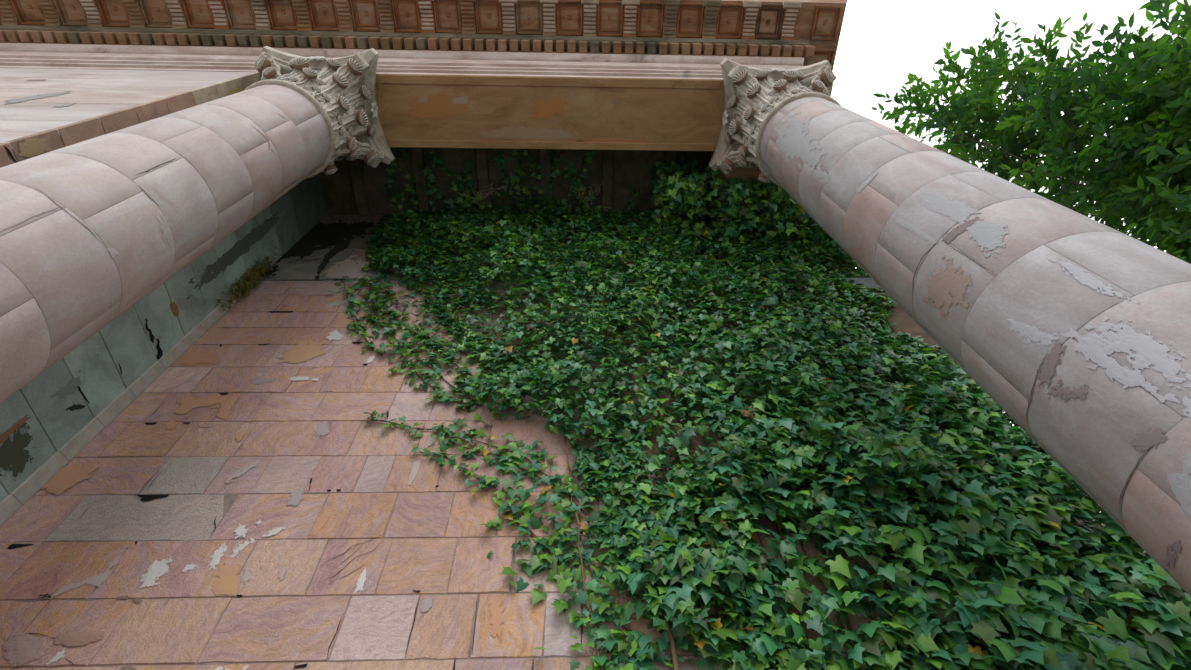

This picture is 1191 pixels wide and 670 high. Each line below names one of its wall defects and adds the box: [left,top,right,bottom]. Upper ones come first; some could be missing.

crack [145,318,163,360]
peeling [139,520,285,597]